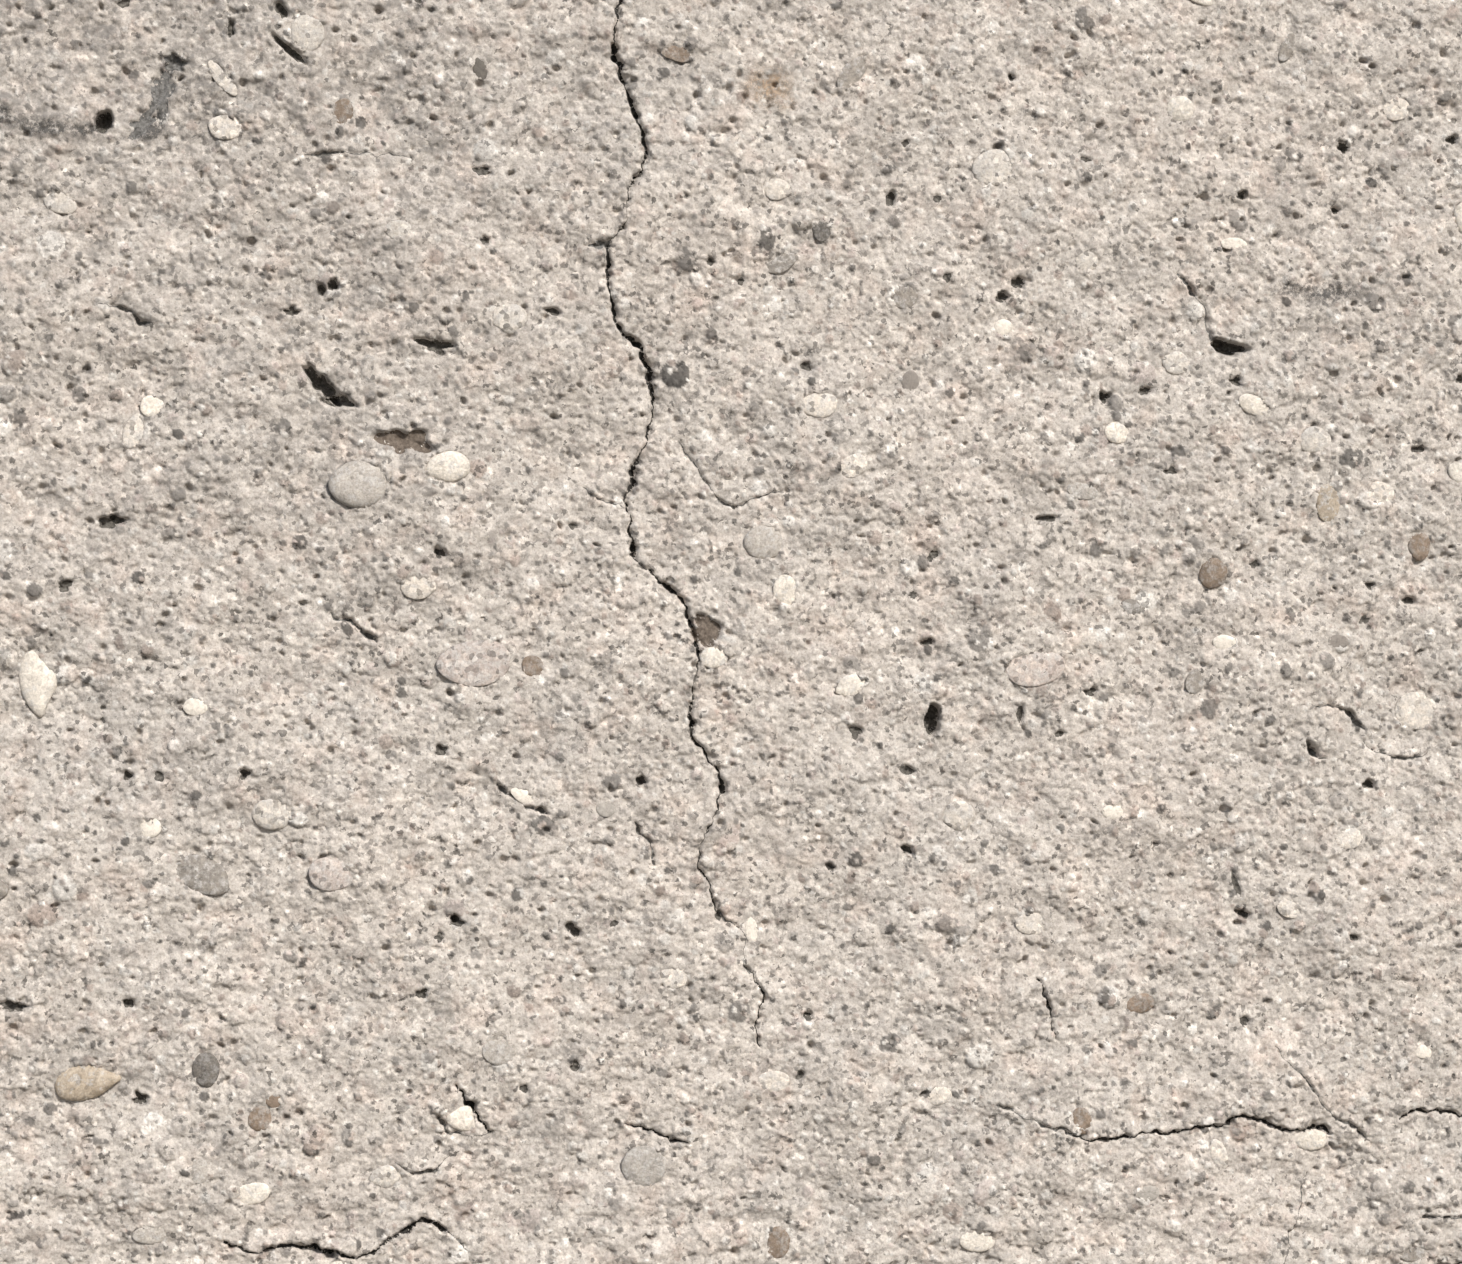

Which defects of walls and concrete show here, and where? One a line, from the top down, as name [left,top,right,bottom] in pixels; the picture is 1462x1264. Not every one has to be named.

crack [583,0,782,1047]
crack [996,1046,1364,1142]
crack [1399,1108,1462,1120]
crack [223,1217,480,1262]
crack [1283,1171,1308,1264]
crack [1422,1213,1462,1221]